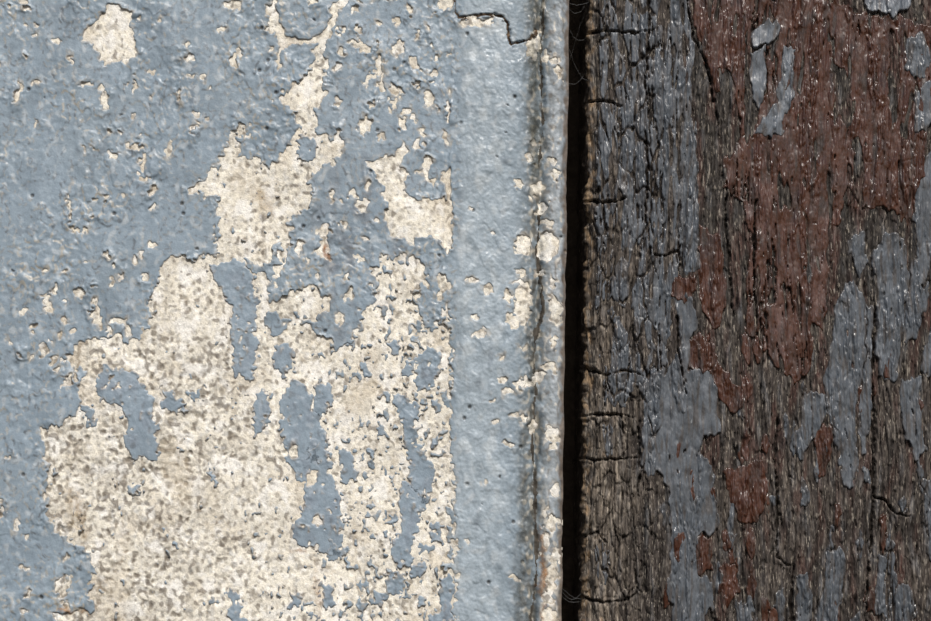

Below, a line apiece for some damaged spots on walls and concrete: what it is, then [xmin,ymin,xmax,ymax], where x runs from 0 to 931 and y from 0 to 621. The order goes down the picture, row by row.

peeling [20,0,470,621]
peeling [471,314,486,338]
peeling [465,277,493,295]
crack [454,0,545,167]
crack [529,215,545,621]
peeling [594,0,931,621]